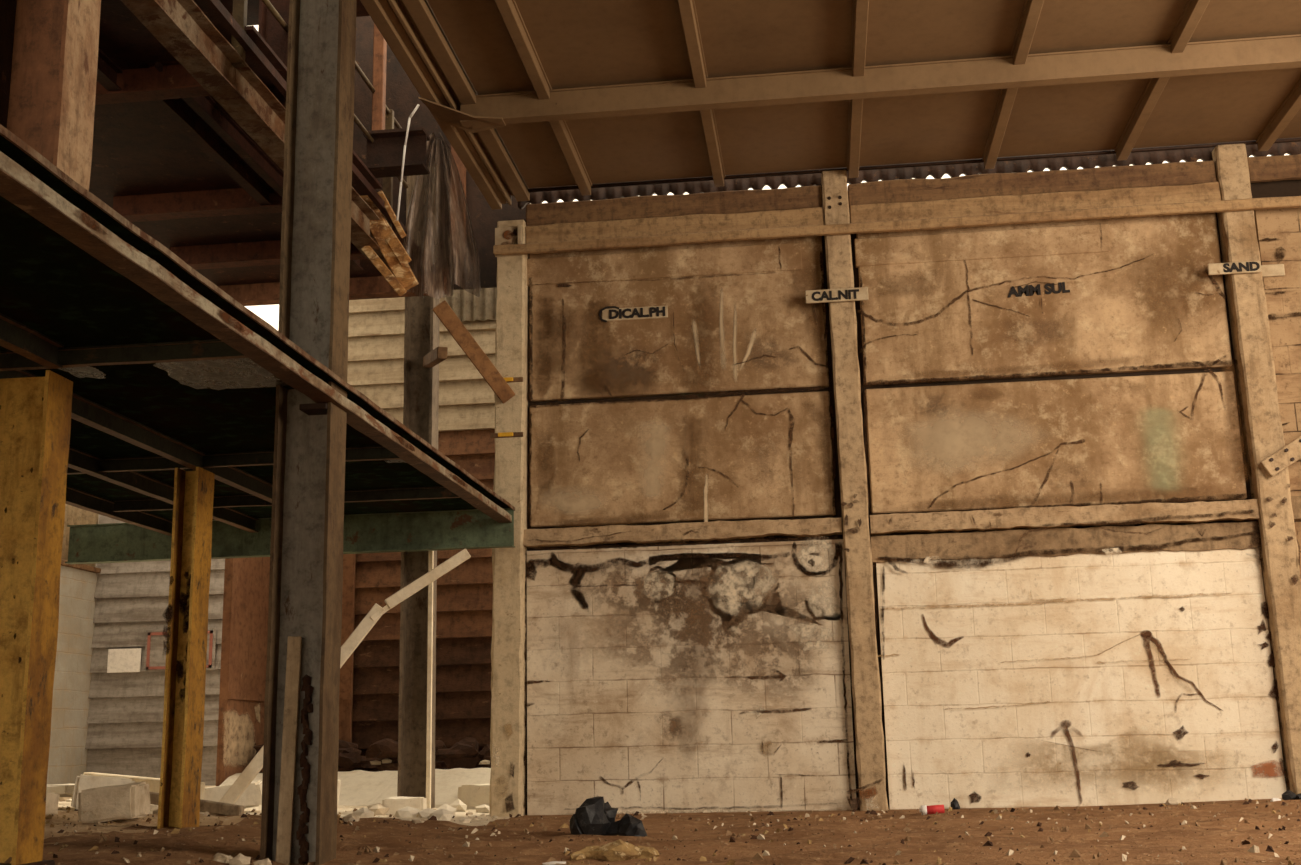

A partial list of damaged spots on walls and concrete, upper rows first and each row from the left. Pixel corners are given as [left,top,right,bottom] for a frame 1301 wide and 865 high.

crack [859,232,1144,355]
crack [526,459,788,608]
crack [929,440,1254,553]
peeling [644,572,673,598]
damp [602,564,776,678]
peeling [711,562,774,614]
crack [886,593,1230,647]
damp [669,718,681,735]
crack [945,701,1048,710]
crack [1057,630,1222,710]